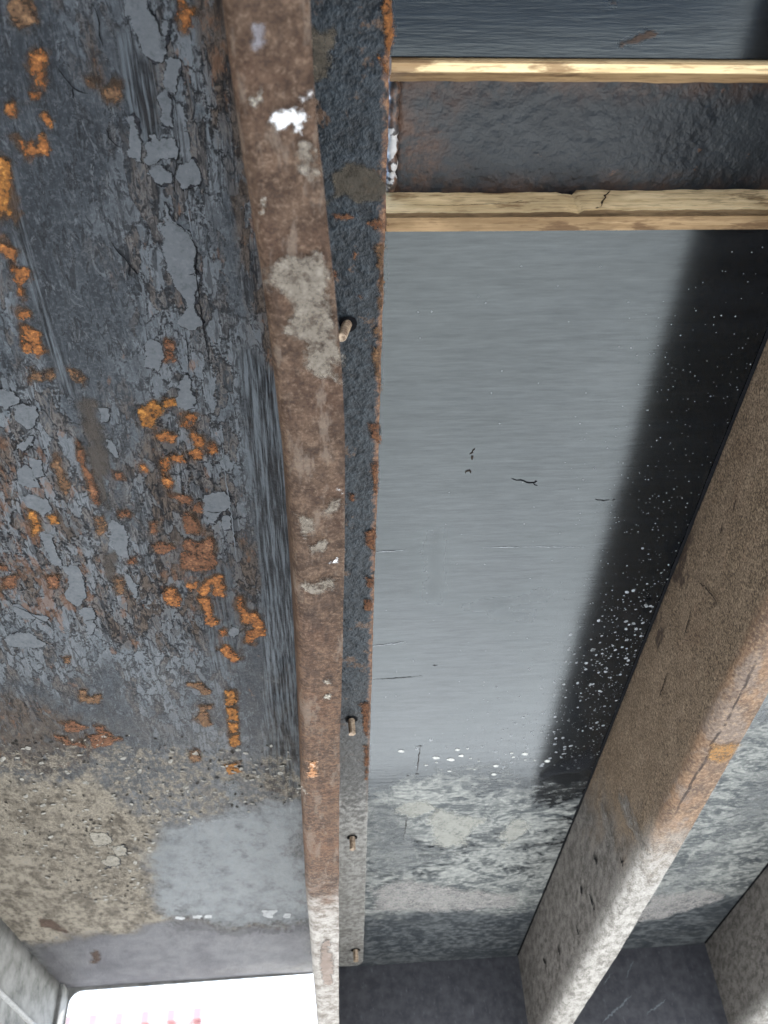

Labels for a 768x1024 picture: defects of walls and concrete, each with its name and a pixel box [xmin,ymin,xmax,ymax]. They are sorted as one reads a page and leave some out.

peeling [124,0,203,191]
corrosion [0,156,23,223]
corrosion [0,235,85,383]
peeling [157,202,205,331]
peeling [0,389,53,518]
corrosion [137,398,267,663]
peeling [39,531,98,635]
corrosion [186,682,241,748]
damp [395,802,483,847]
damp [262,910,291,918]
damp [371,882,517,911]
damp [638,890,723,922]